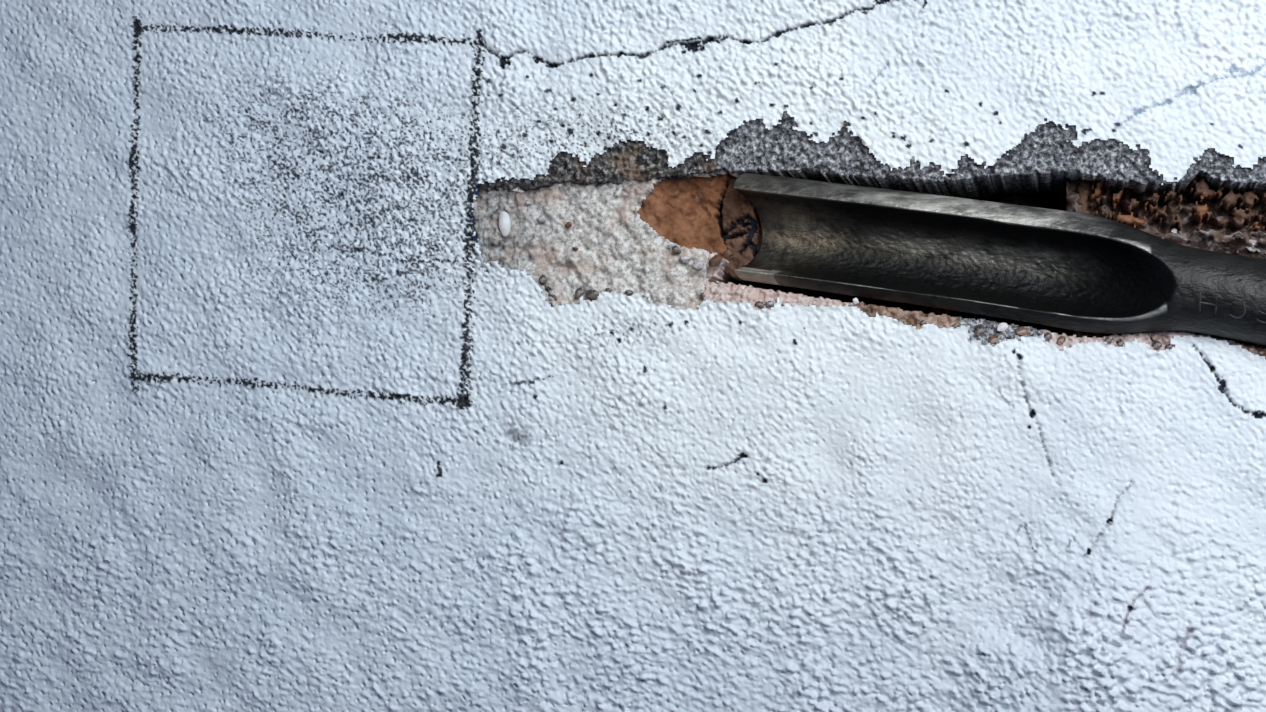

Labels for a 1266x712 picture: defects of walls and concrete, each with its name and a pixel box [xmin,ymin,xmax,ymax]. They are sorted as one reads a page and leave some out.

crack [479,0,927,69]
crack [1128,65,1262,119]
spalling [472,97,1266,359]
crack [1193,345,1266,418]